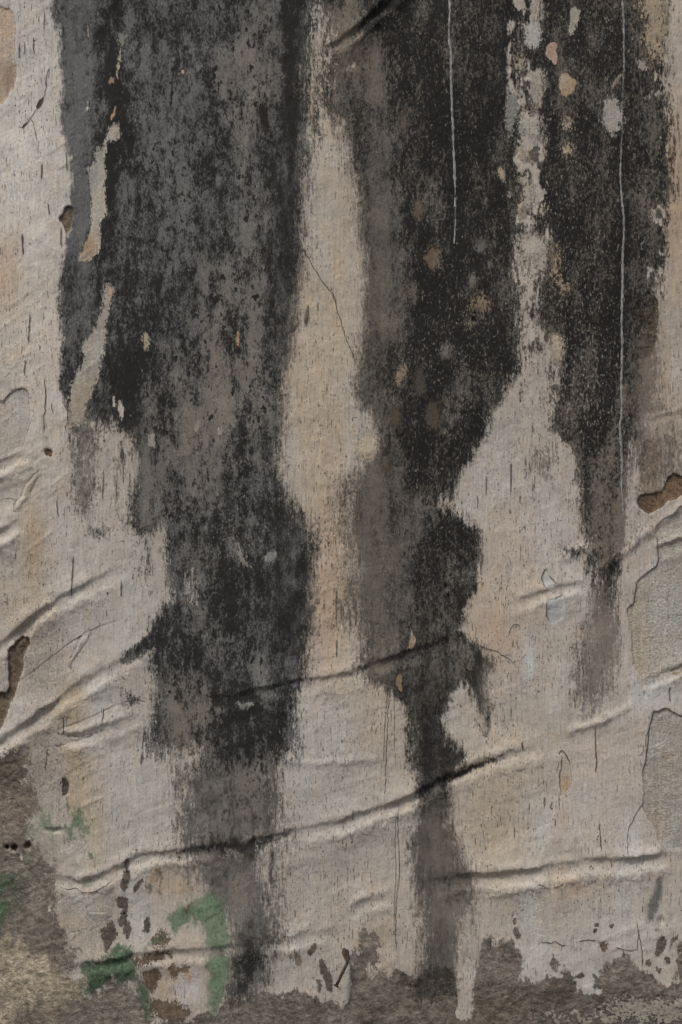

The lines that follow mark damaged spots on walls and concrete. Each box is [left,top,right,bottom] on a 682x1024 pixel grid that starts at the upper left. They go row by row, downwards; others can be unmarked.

water stain [512,0,681,623]
spalling [0,636,30,728]
water stain [51,0,545,1016]
peeling [627,440,682,681]
water stain [31,805,89,841]
spalling [0,744,682,1024]